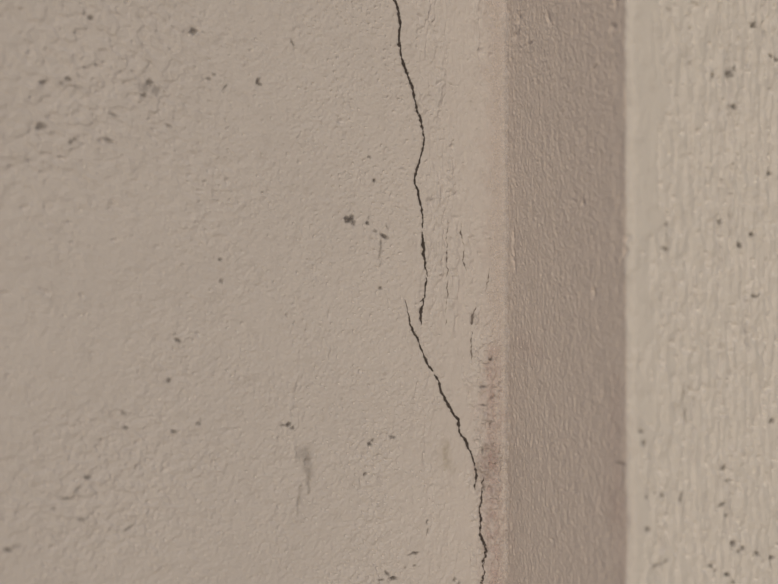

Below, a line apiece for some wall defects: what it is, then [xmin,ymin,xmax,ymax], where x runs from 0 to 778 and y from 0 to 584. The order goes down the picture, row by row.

crack [393,0,488,584]